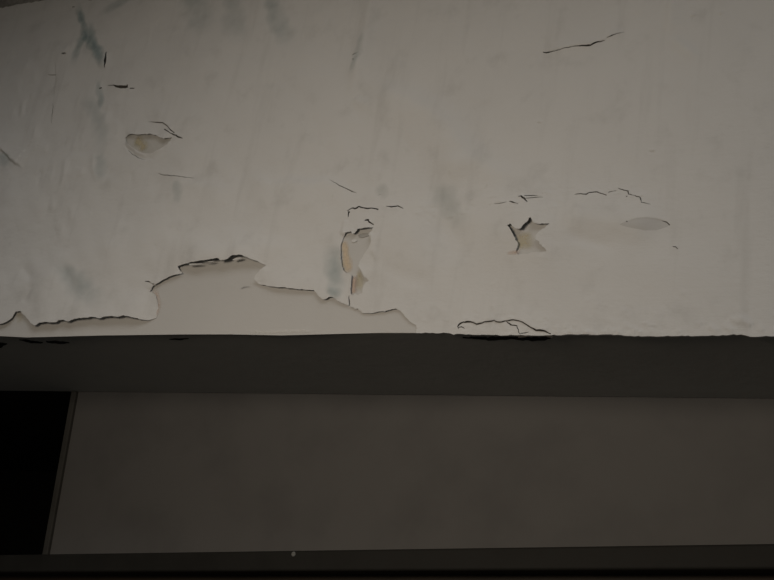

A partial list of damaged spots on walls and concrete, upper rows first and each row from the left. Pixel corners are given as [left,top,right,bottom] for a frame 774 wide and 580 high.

peeling [0,0,42,8]
peeling [122,120,182,162]
peeling [500,210,555,261]
peeling [0,204,428,337]
crack [463,334,550,342]